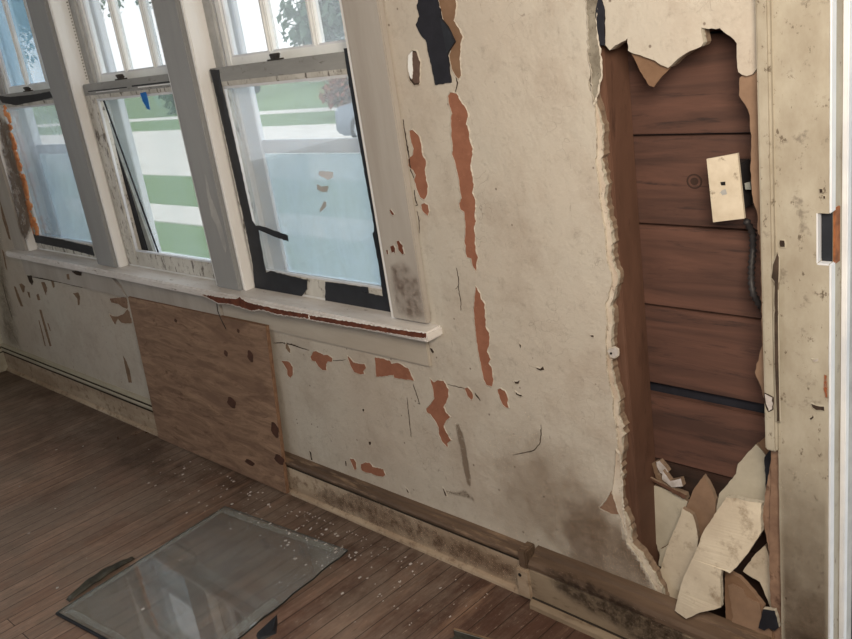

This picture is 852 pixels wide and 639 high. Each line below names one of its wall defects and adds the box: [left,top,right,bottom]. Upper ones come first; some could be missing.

peeling [438,0,464,81]
spalling [585,0,603,106]
peeling [407,128,430,217]
peeling [447,91,479,272]
peeling [201,293,435,354]
peeling [310,350,333,371]
peeling [347,355,415,382]
peeling [426,377,452,448]
peeling [473,286,524,409]
peeling [764,393,774,412]
spalling [611,448,628,538]
damp [556,574,683,639]